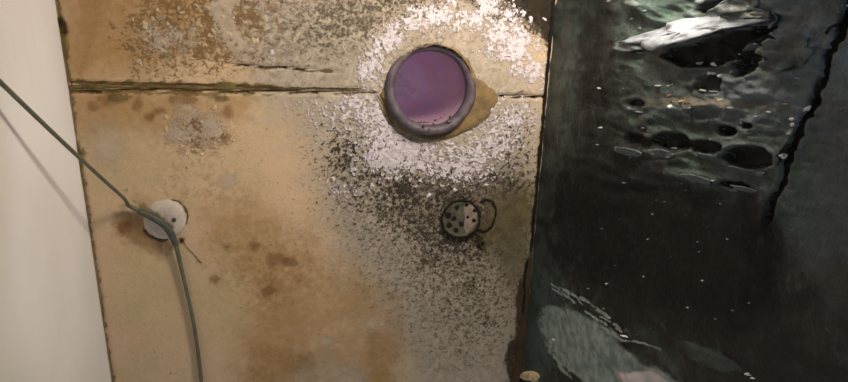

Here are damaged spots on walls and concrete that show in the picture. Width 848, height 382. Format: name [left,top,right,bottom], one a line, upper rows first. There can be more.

peeling [611,0,814,109]
crack [55,0,393,382]
leakage [277,0,556,382]
spalling [614,103,789,193]
crack [763,0,848,234]
leakage [539,283,675,382]
leakage [685,341,755,379]